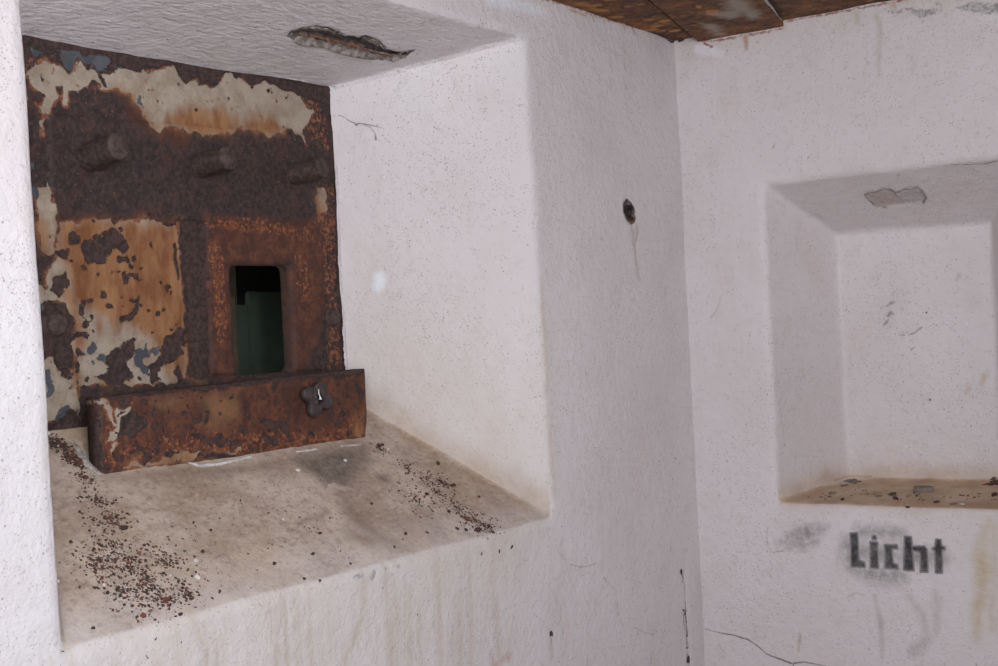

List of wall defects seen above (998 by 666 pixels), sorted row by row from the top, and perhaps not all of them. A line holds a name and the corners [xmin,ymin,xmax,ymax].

spalling [286,25,415,62]
leakage [95,440,475,666]
crack [680,569,826,666]